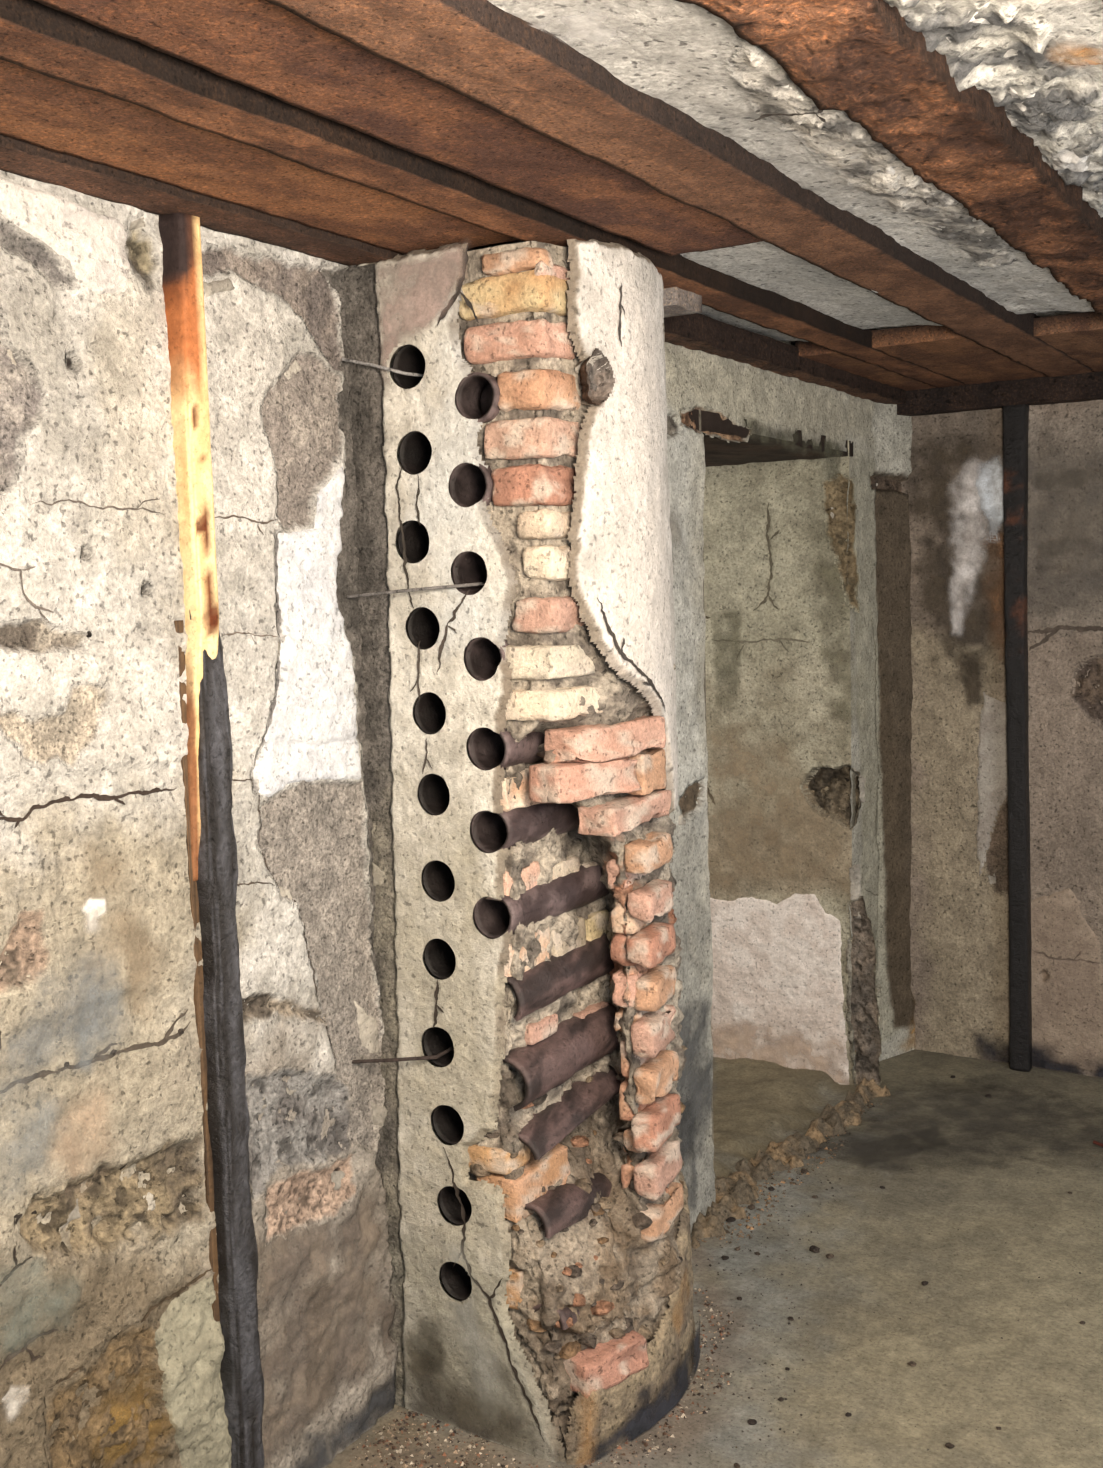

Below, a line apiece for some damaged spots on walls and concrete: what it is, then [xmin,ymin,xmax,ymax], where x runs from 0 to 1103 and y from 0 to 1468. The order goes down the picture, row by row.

spalling [575,348,615,405]
crack [597,597,666,712]
damp [913,439,1008,876]
crack [1028,625,1103,651]
spalling [1069,654,1103,731]
crack [0,787,176,828]
spalling [800,764,866,830]
crack [0,1009,191,1093]